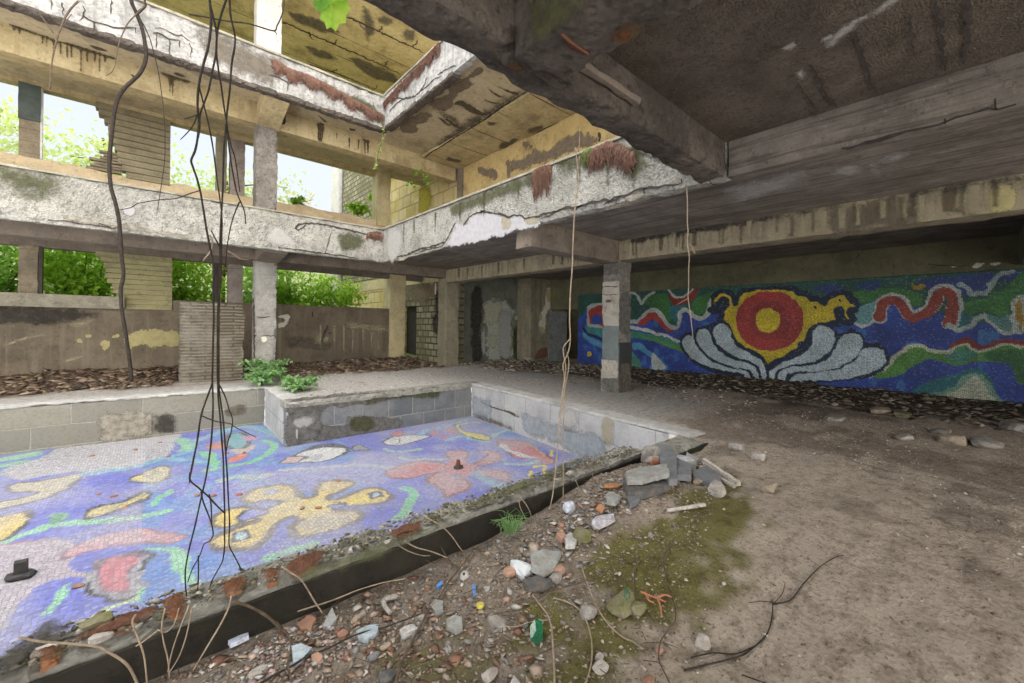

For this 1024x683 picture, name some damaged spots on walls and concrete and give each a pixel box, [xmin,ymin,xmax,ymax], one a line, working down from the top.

damp [9,24,116,71]
damp [439,96,517,144]
crack [841,98,1016,150]
peeling [398,212,541,261]
damp [450,173,532,217]
crack [278,161,719,263]
peeling [482,296,518,361]